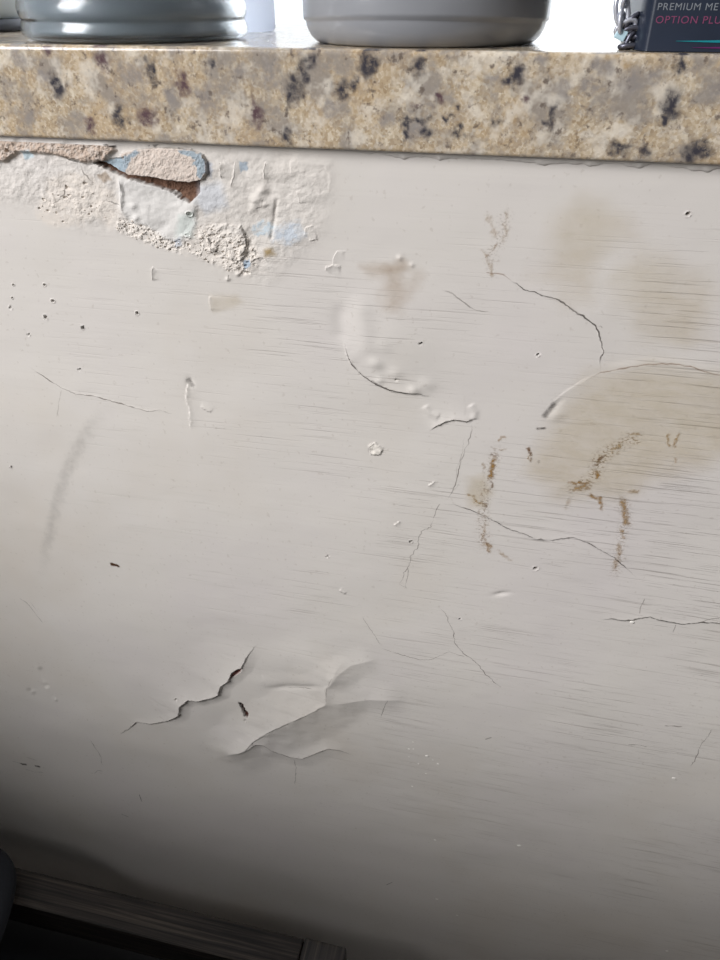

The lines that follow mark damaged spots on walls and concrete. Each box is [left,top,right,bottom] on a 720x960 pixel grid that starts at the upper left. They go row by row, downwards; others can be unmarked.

flaking render [0,141,334,286]
crack [518,285,604,358]
rust [572,433,639,508]
peeling [150,640,356,759]